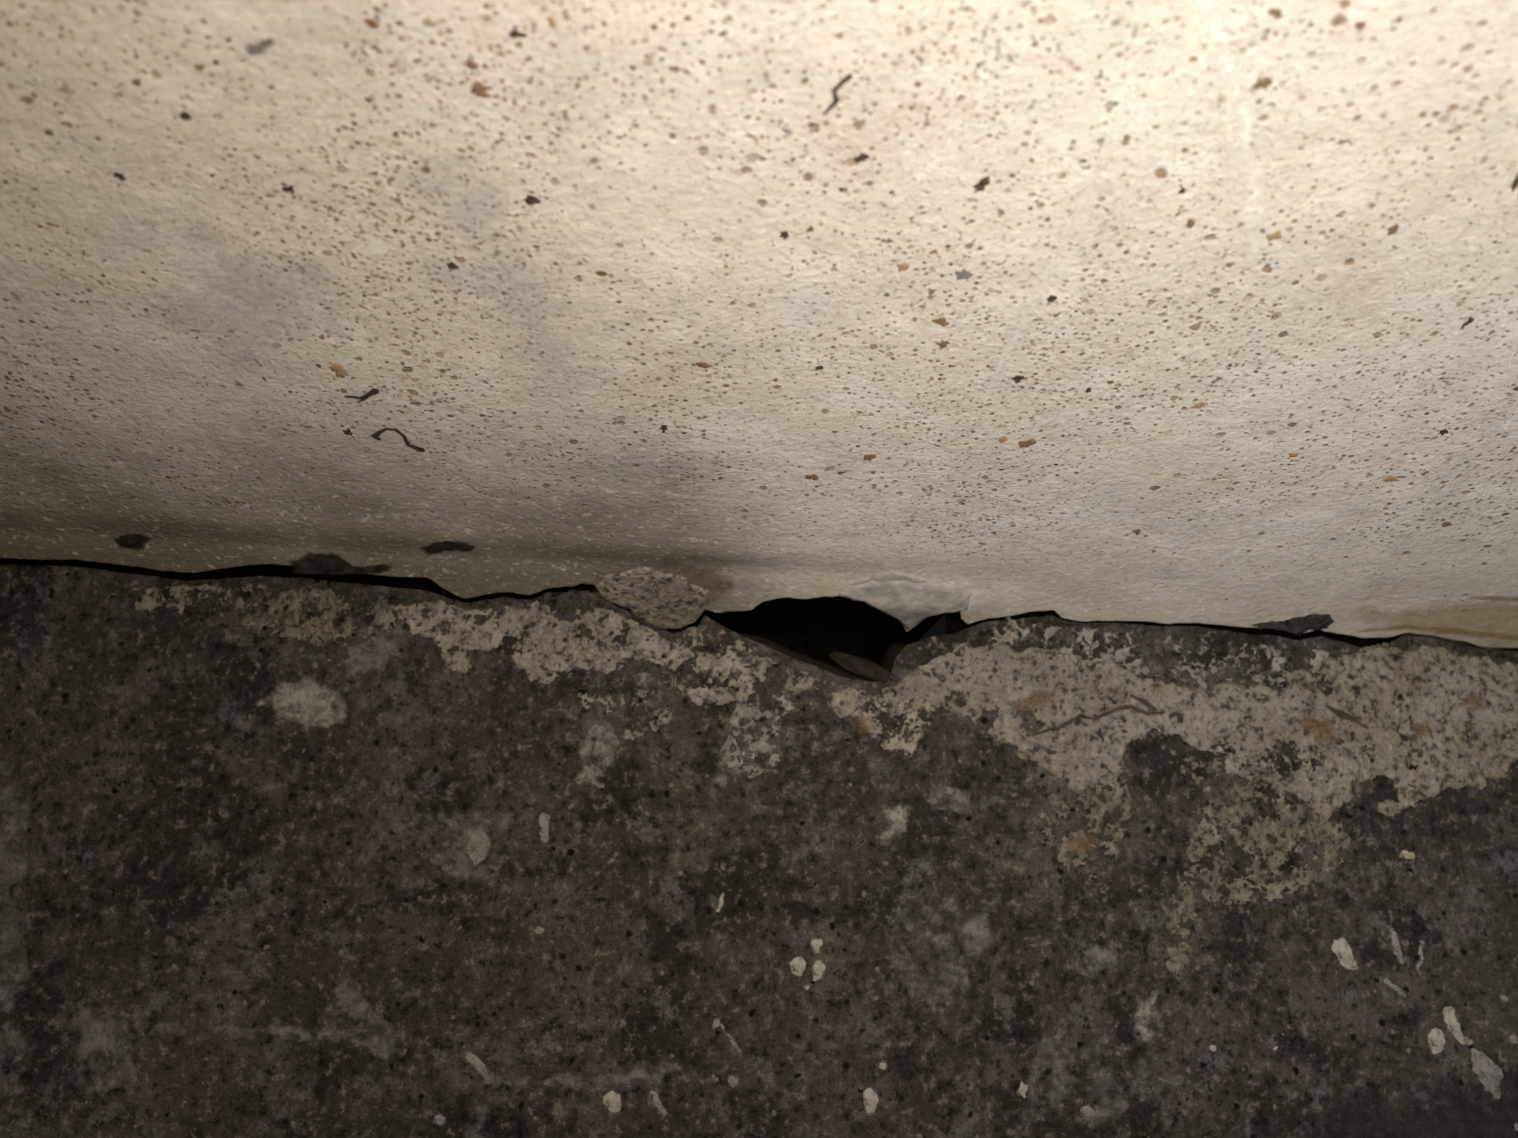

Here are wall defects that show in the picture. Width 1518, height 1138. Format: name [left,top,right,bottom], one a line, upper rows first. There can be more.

crack [0,558,692,634]
crack [945,610,1518,651]
water stain [1369,597,1518,643]
spalling [133,553,1518,981]